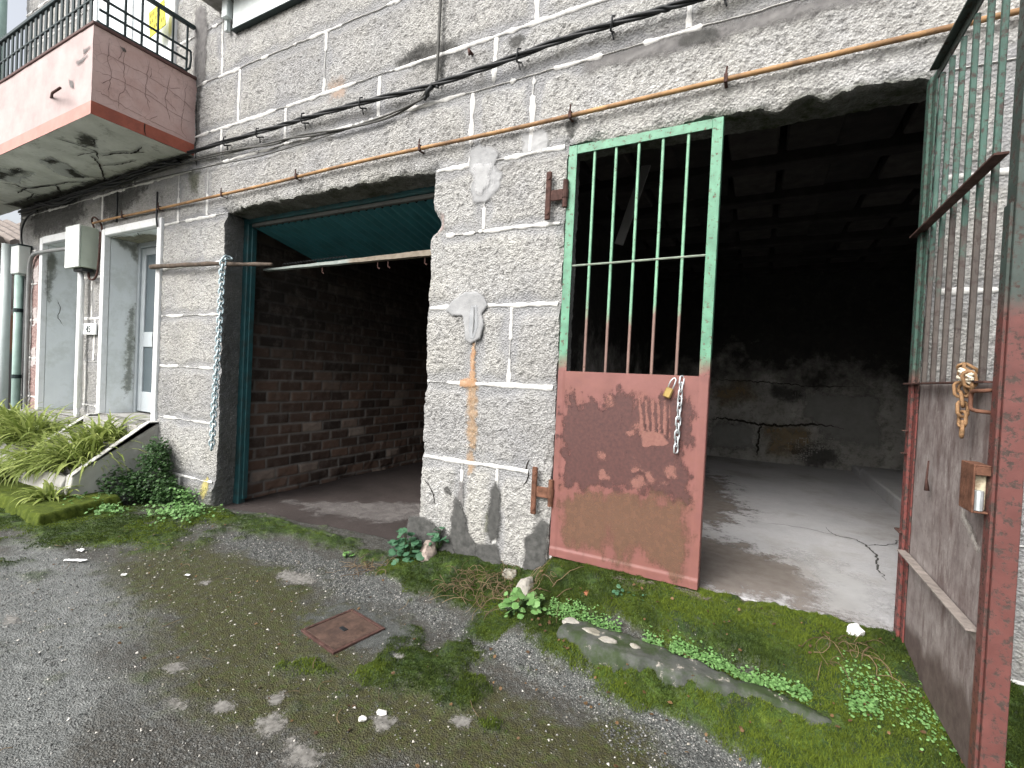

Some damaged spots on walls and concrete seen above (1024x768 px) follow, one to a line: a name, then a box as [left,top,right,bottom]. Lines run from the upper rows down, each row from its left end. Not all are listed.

crack [3,38,198,200]
corrosion [459,342,477,471]
crack [710,417,843,454]
damp [282,481,501,564]
damp [523,519,548,571]
crack [771,523,897,578]